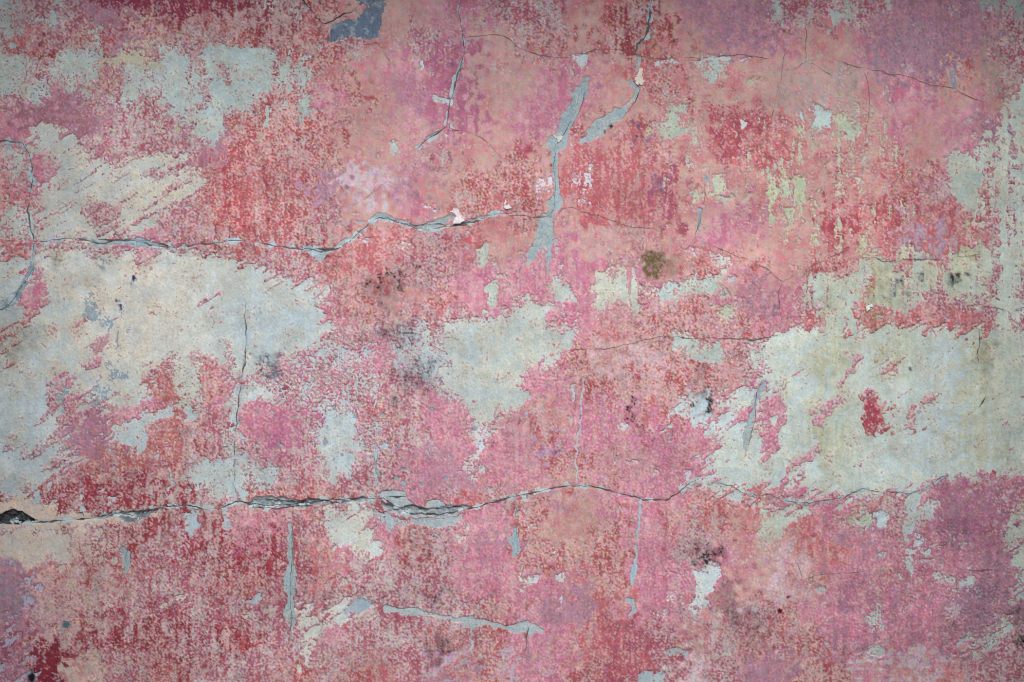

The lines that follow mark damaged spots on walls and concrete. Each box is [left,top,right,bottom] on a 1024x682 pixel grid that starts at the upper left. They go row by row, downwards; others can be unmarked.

peeling [0,0,595,682]
crack [0,81,643,314]
crack [2,300,946,633]
damp [641,250,665,279]
peeling [580,44,1024,664]